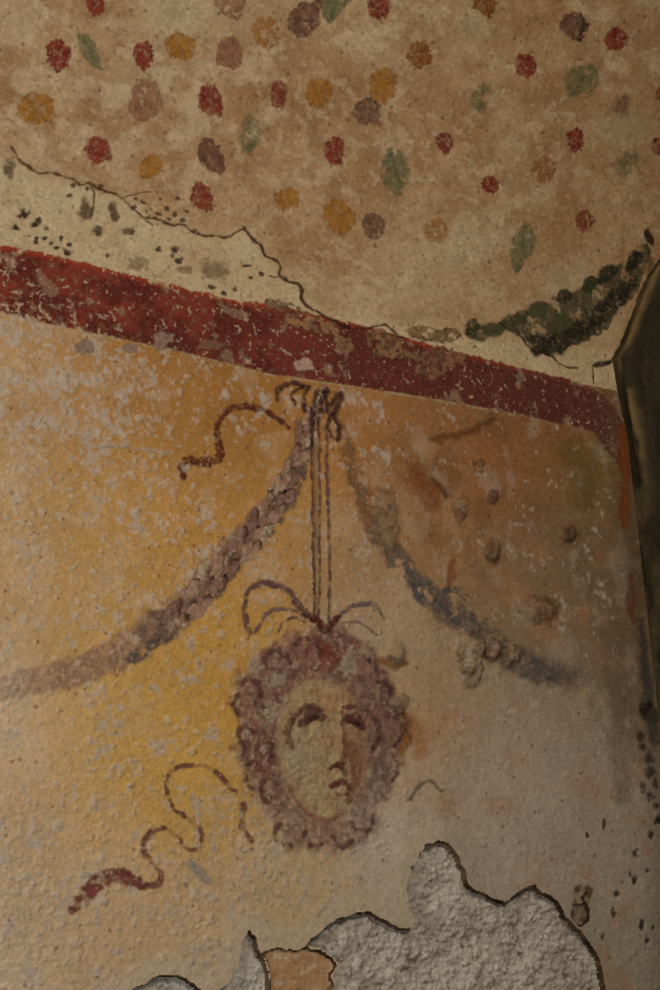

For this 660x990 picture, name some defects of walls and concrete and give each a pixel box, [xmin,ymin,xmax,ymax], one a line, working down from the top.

crack [11,146,407,340]
crack [519,323,629,382]
flaking render [132,975,202,990]
flaking render [219,840,606,990]